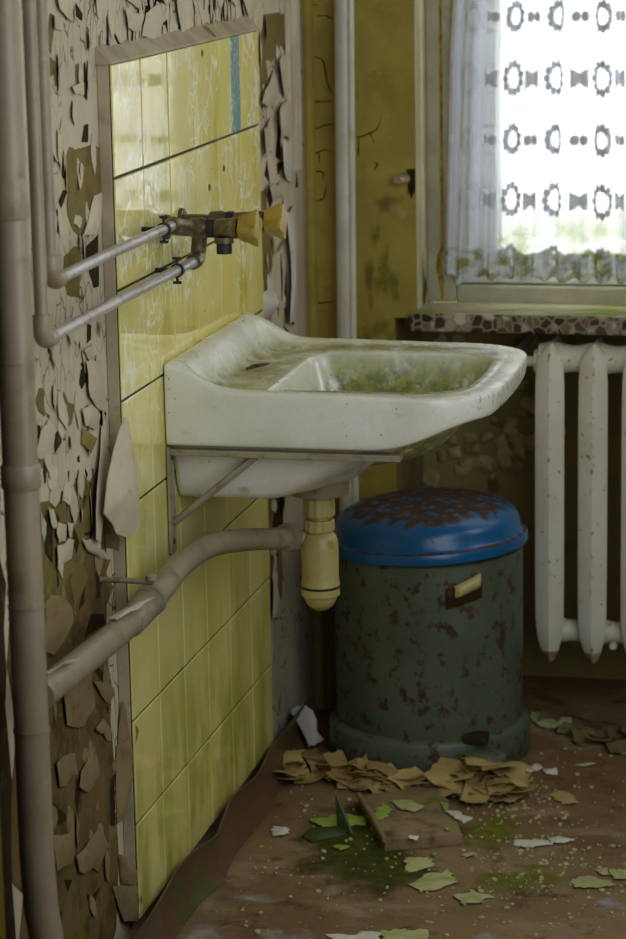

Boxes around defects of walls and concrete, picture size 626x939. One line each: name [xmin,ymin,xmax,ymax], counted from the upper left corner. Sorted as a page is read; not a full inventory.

peeling [48,0,299,332]
crack [314,56,335,201]
crack [356,120,381,170]
spalling [36,321,153,675]
peeling [268,549,283,619]
peeling [268,496,290,528]
spalling [48,660,143,939]
water stain [300,804,432,896]